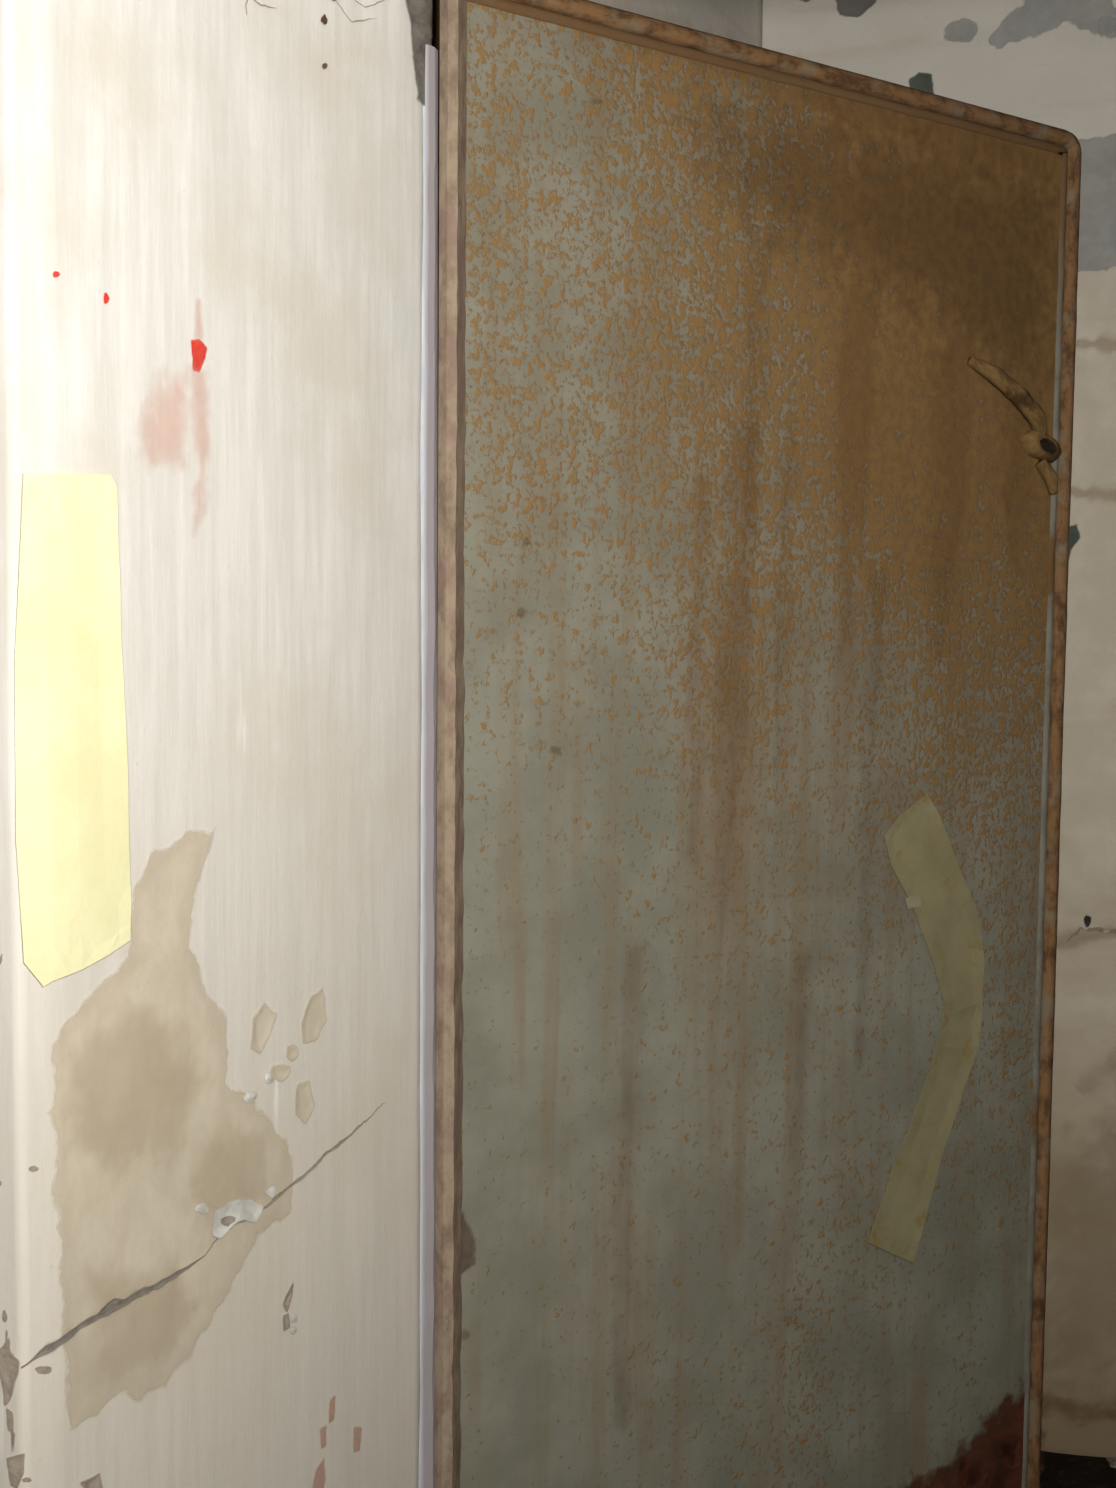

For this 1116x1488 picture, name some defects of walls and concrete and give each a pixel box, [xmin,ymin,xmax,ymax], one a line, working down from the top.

peeling [406,0,432,105]
peeling [944,0,1116,48]
peeling [1078,134,1116,271]
peeling [243,989,326,1123]
damp [52,832,292,1427]
crack [21,1103,384,1369]
corrosion [460,1215,475,1274]
flaking render [0,1311,51,1488]
corrosion [909,1393,1044,1488]